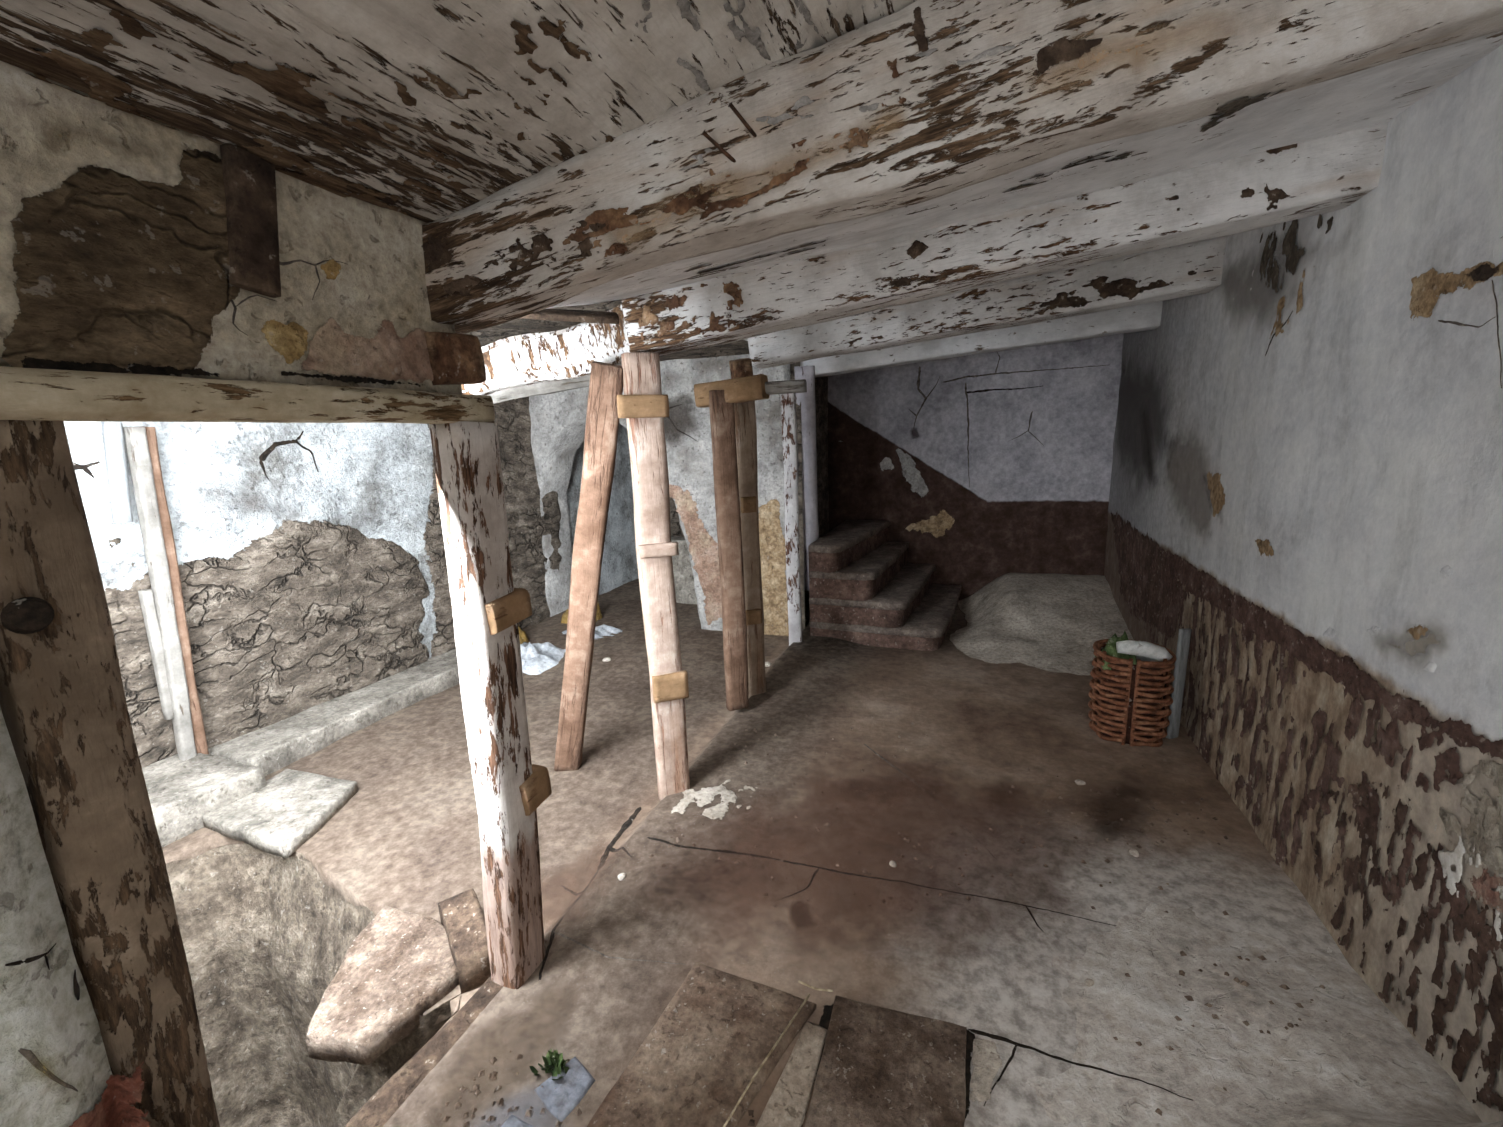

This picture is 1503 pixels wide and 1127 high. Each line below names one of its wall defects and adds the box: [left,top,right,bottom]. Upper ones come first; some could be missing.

peeling [507,19,592,115]
peeling [1033,38,1103,76]
flaking render [2,9,482,383]
peeling [491,139,810,271]
peeling [986,268,1213,316]
leakage [1226,247,1285,313]
flaking render [1409,261,1503,321]
leakage [1118,366,1164,480]
flaking render [178,458,456,748]
flaking render [105,562,178,768]
crack [539,807,1116,980]
crack [968,1029,1193,1106]